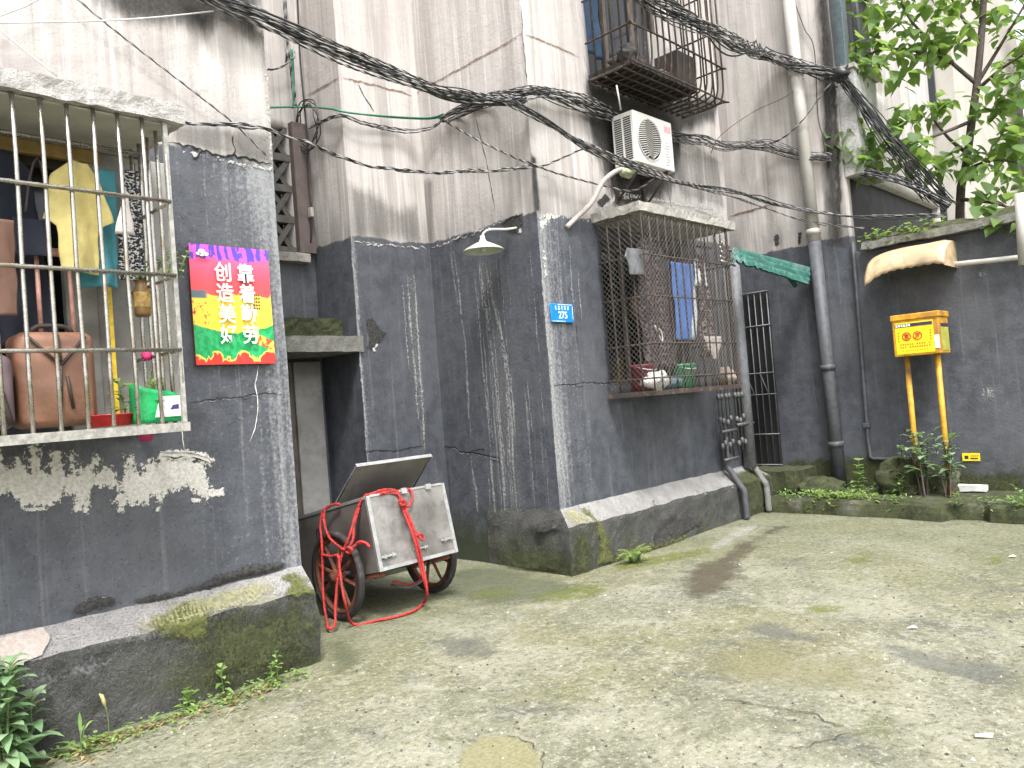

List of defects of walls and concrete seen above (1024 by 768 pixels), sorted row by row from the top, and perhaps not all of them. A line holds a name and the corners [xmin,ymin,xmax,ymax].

crack [191,392,287,404]
peeling [366,318,386,352]
damp [403,278,425,448]
damp [451,257,471,432]
damp [471,255,547,512]
crack [550,380,607,388]
peeling [0,443,225,514]
crack [364,446,506,462]
damp [684,527,755,597]